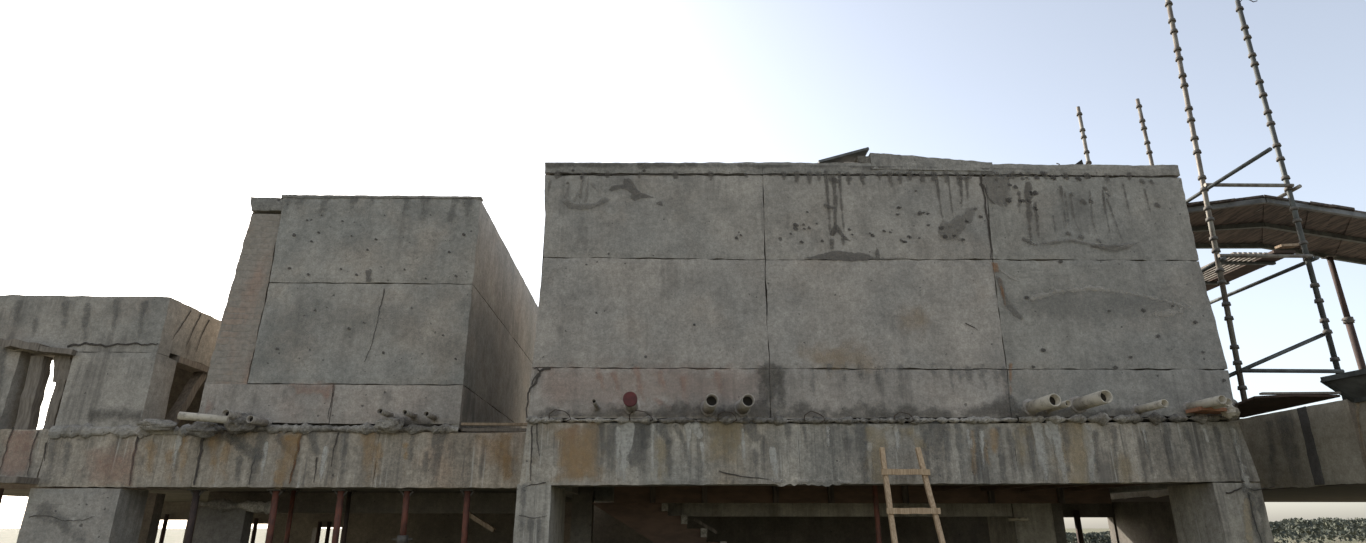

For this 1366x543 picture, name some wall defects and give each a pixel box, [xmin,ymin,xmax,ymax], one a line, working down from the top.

leakage [638,163,713,179]
leakage [738,164,1161,249]
crack [67,311,210,349]
crack [364,289,385,362]
leakage [539,404,704,478]
leakage [841,397,1128,479]